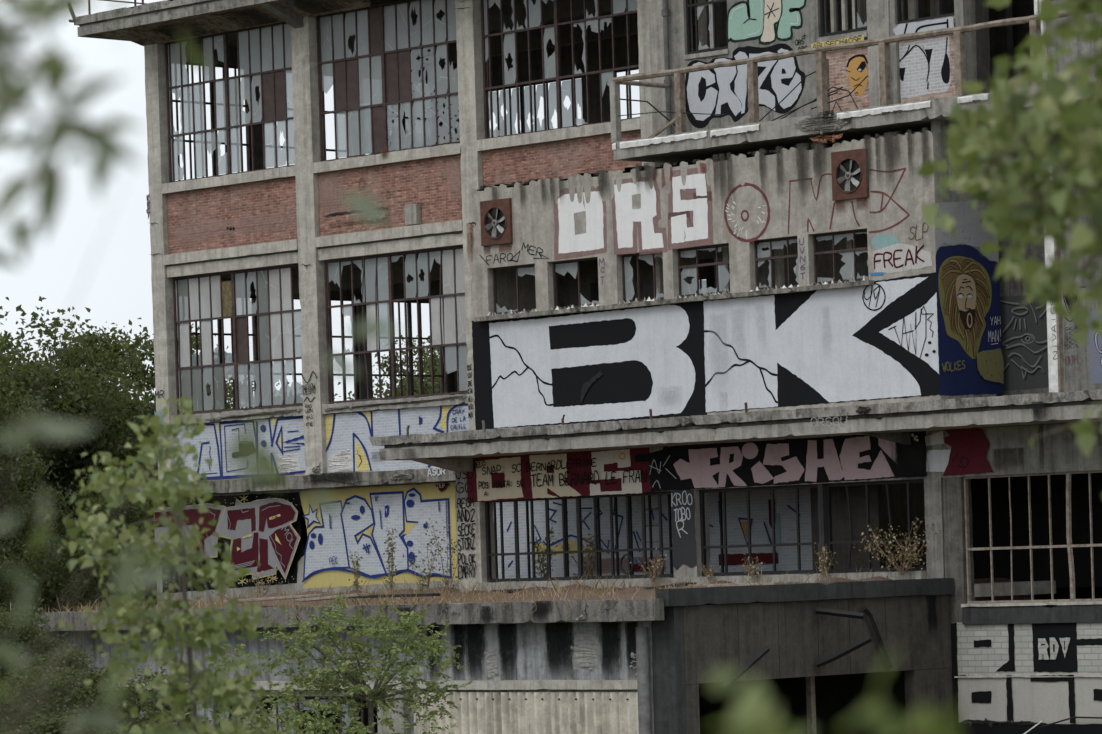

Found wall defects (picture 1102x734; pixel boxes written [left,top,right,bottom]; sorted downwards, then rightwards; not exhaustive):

water stain [541,176,563,198]
water stain [598,170,607,189]
water stain [713,153,732,192]
water stain [427,606,516,672]
water stain [532,601,573,668]
water stain [601,622,637,667]